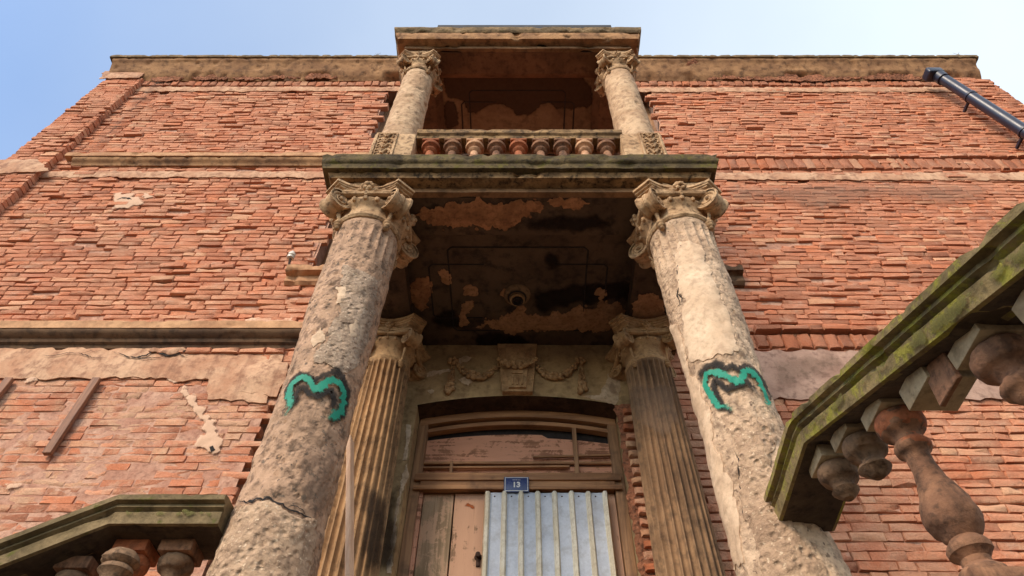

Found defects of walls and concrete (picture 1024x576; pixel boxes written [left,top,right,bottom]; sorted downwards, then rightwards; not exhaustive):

peeling [415,197,590,231]
spalling [311,265,378,373]
crack [46,347,188,359]
peeling [156,347,285,355]
peeling [410,240,828,576]
crack [238,496,311,518]